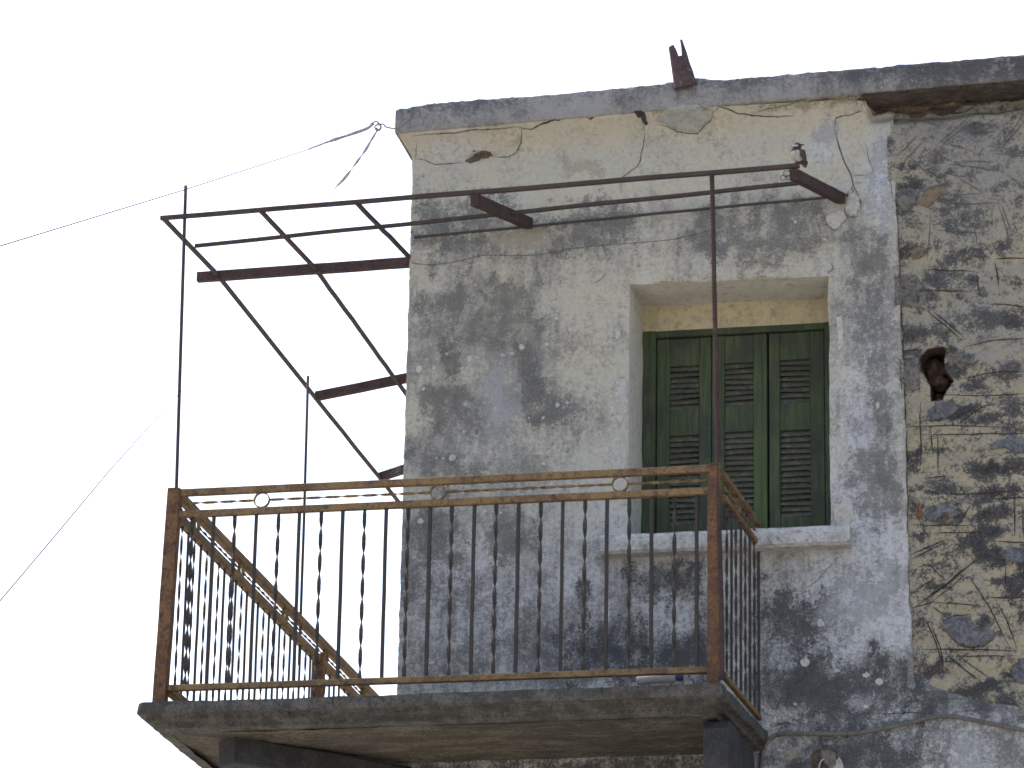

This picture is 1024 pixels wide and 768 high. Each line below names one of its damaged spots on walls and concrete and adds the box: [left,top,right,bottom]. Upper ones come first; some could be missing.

flaking render [465,150,493,164]
crack [415,115,602,165]
flaking render [634,104,714,134]
flaking render [823,181,860,231]
crack [834,100,901,279]
flaking render [894,274,927,309]
water stain [389,136,904,602]
spalling [899,346,976,422]
crack [901,306,910,606]
water stain [546,556,707,688]
water stain [744,559,1024,768]